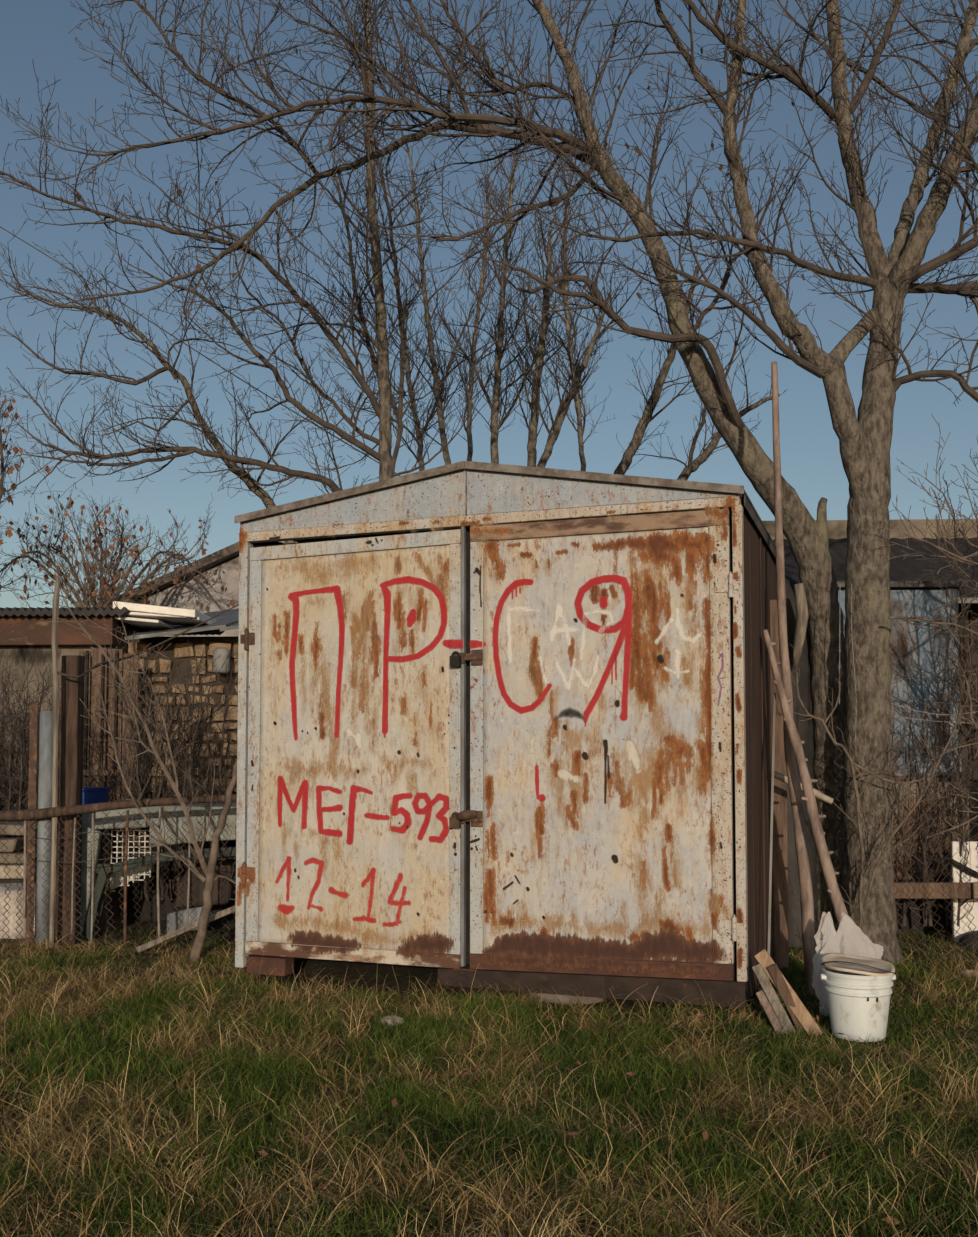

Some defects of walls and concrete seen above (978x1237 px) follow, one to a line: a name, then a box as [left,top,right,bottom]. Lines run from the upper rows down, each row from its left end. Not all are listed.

corrosion [393,553,450,654]
corrosion [272,611,322,672]
corrosion [319,697,327,739]
corrosion [342,590,381,745]
corrosion [400,697,433,748]
corrosion [460,496,739,892]
corrosion [481,774,728,977]
corrosion [289,930,362,954]
corrosion [396,932,454,960]